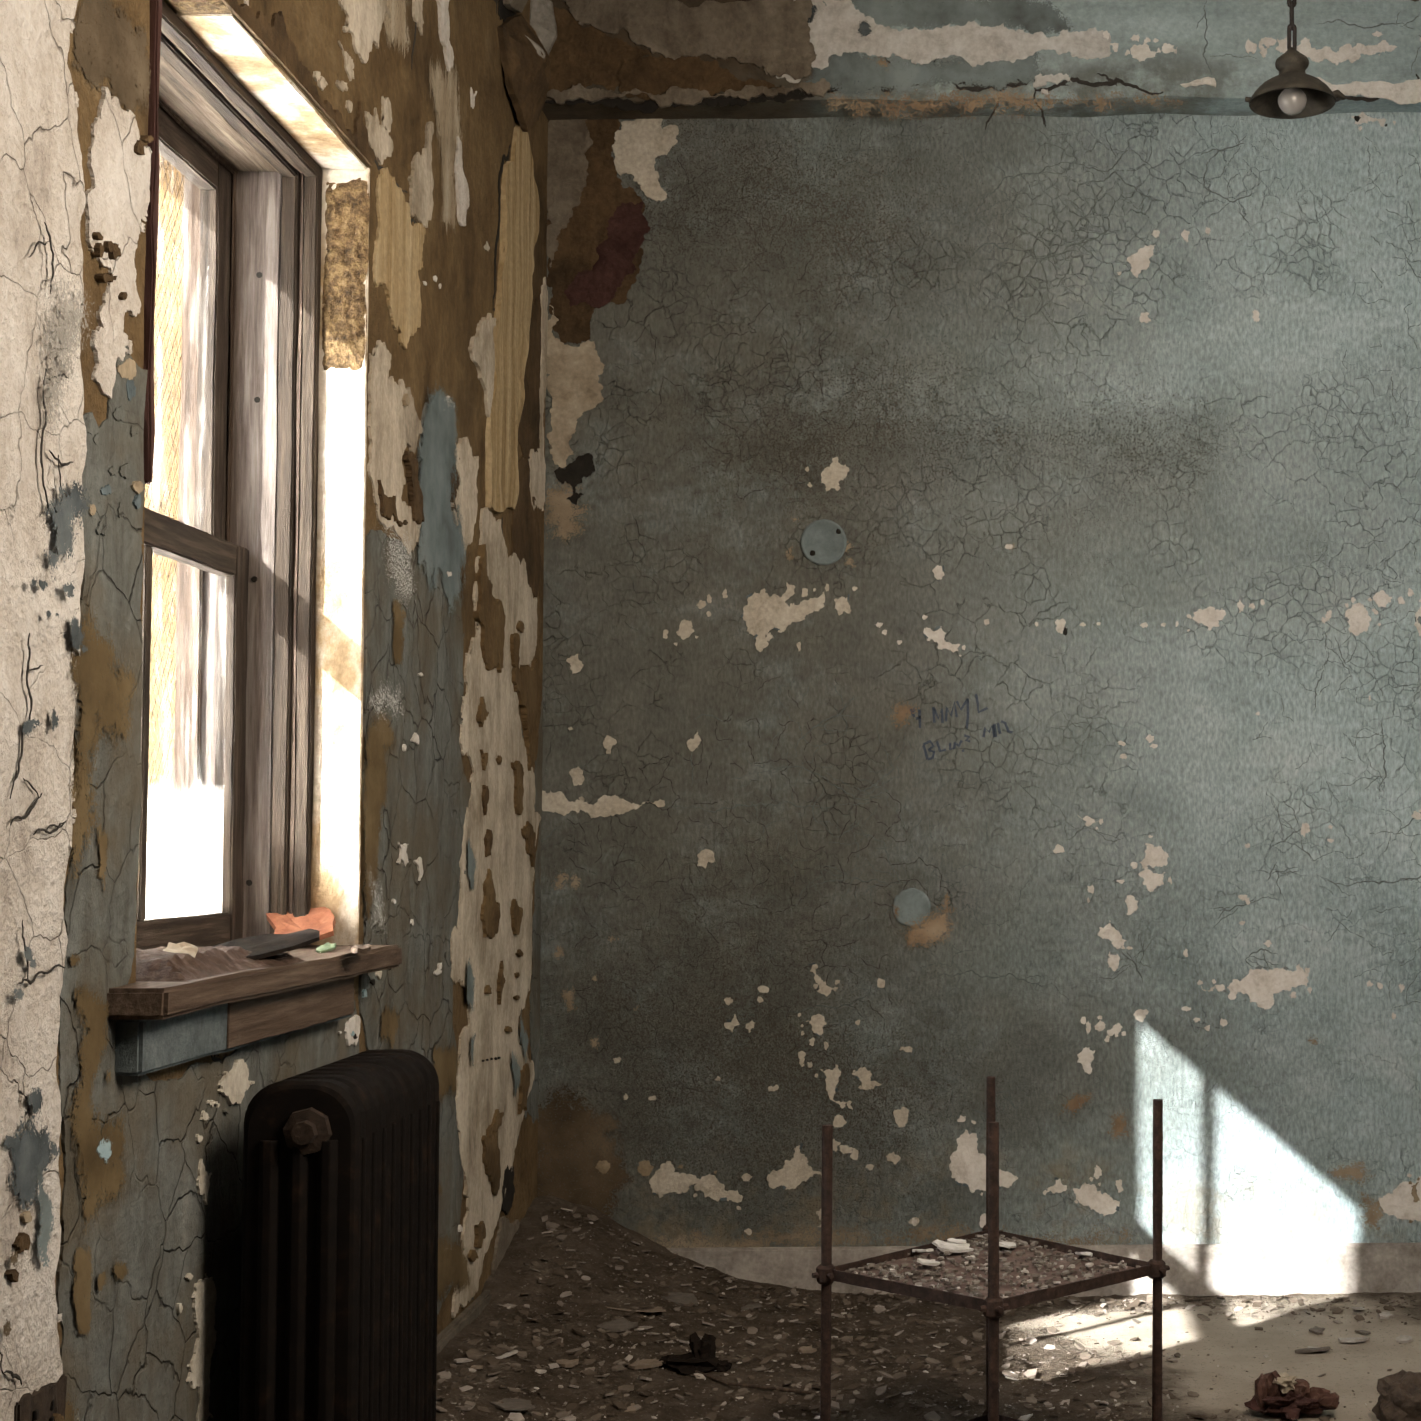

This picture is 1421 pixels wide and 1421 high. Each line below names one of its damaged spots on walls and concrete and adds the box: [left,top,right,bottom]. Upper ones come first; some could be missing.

peeling [547,0,1177,108]
peeling [1245,31,1421,131]
crack [29,222,54,293]
crack [545,57,1262,500]
crack [40,369,73,550]
crack [1210,137,1421,1008]
crack [10,633,67,835]
peeling [0,0,858,1421]
crack [18,920,66,985]
peeling [798,1013,900,1170]
peeling [949,1115,1018,1196]
peeling [1043,1165,1123,1216]